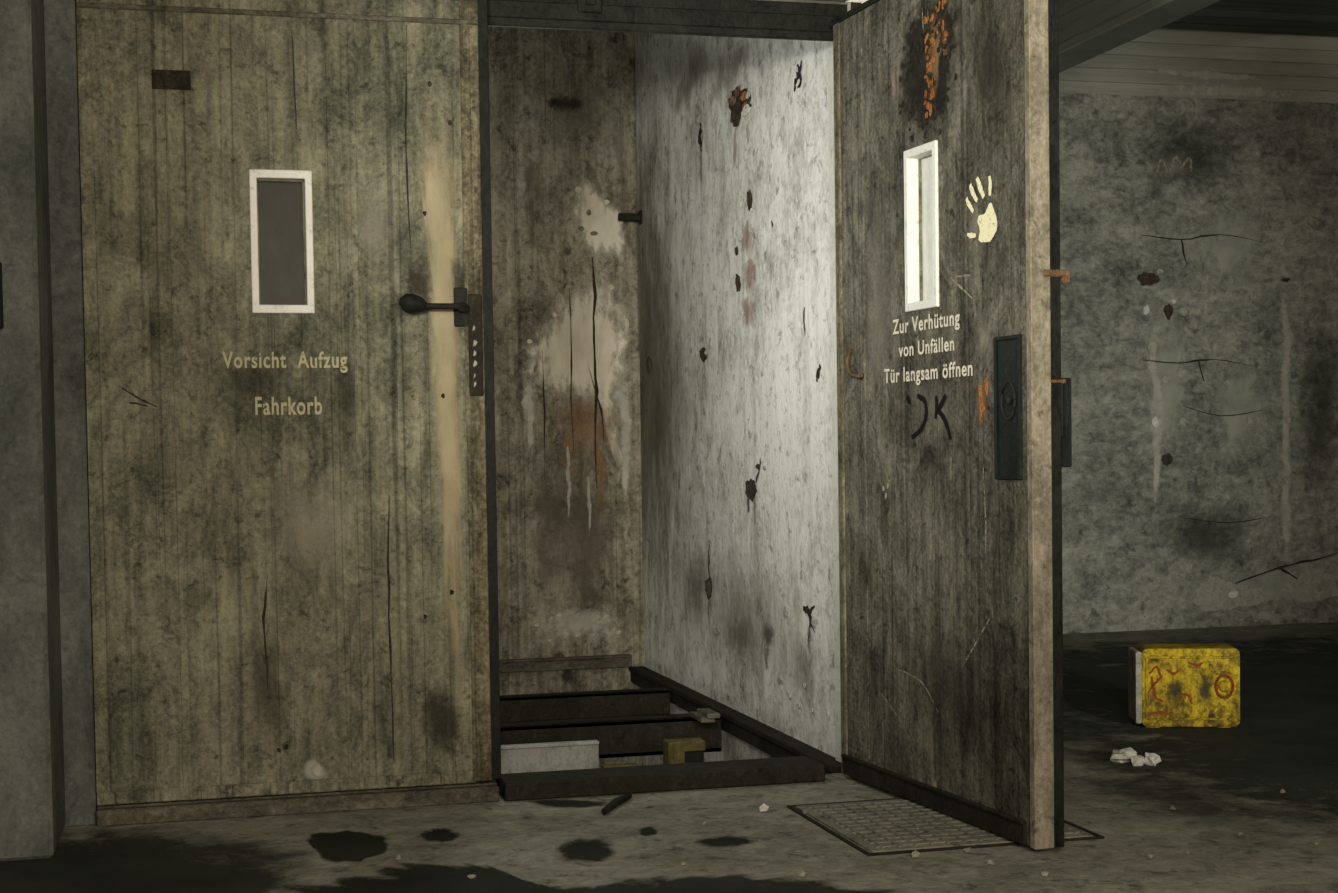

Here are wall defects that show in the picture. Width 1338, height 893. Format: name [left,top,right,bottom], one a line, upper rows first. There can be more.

rust [924,0,948,118]
leakage [534,606,621,642]